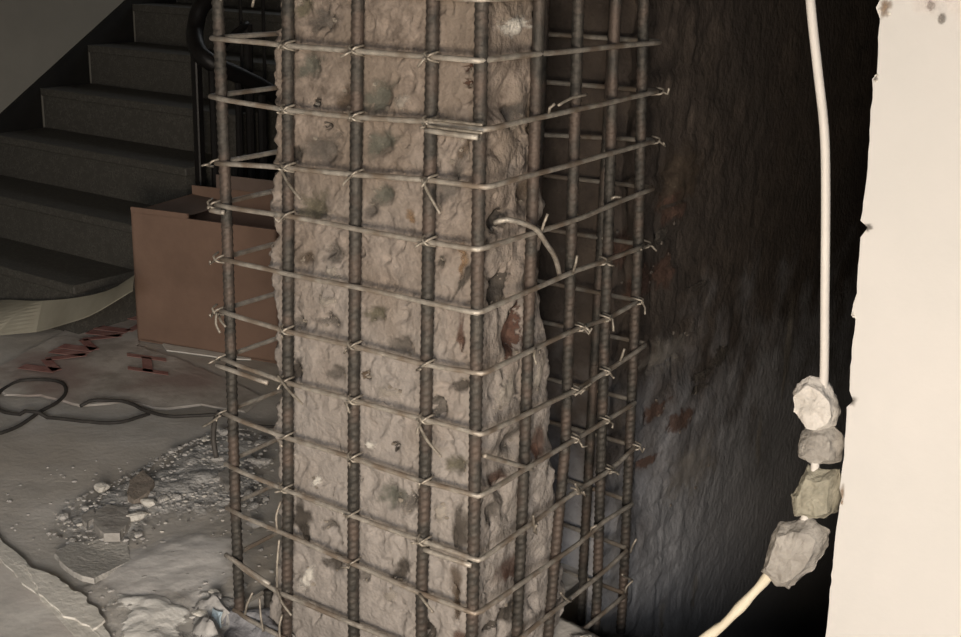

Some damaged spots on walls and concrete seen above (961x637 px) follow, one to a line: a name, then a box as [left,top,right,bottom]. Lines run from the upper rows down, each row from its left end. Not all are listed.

spalling [496,14,526,35]
spalling [438,139,471,206]
spalling [299,198,326,219]
spalling [484,206,506,259]
spalling [486,272,523,360]
spalling [454,378,470,391]
spalling [432,396,448,418]
spalling [300,566,316,589]
spalling [323,552,342,572]
spalling [391,558,410,582]
spalling [496,601,513,622]
spalling [427,620,436,637]